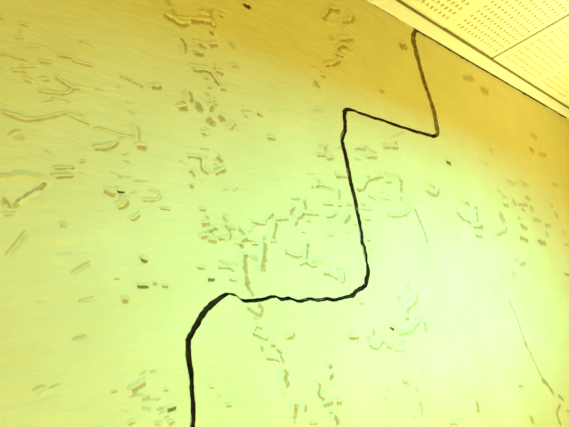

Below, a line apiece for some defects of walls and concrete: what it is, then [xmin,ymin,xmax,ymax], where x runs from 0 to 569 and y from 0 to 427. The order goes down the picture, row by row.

crack [185,28,566,427]